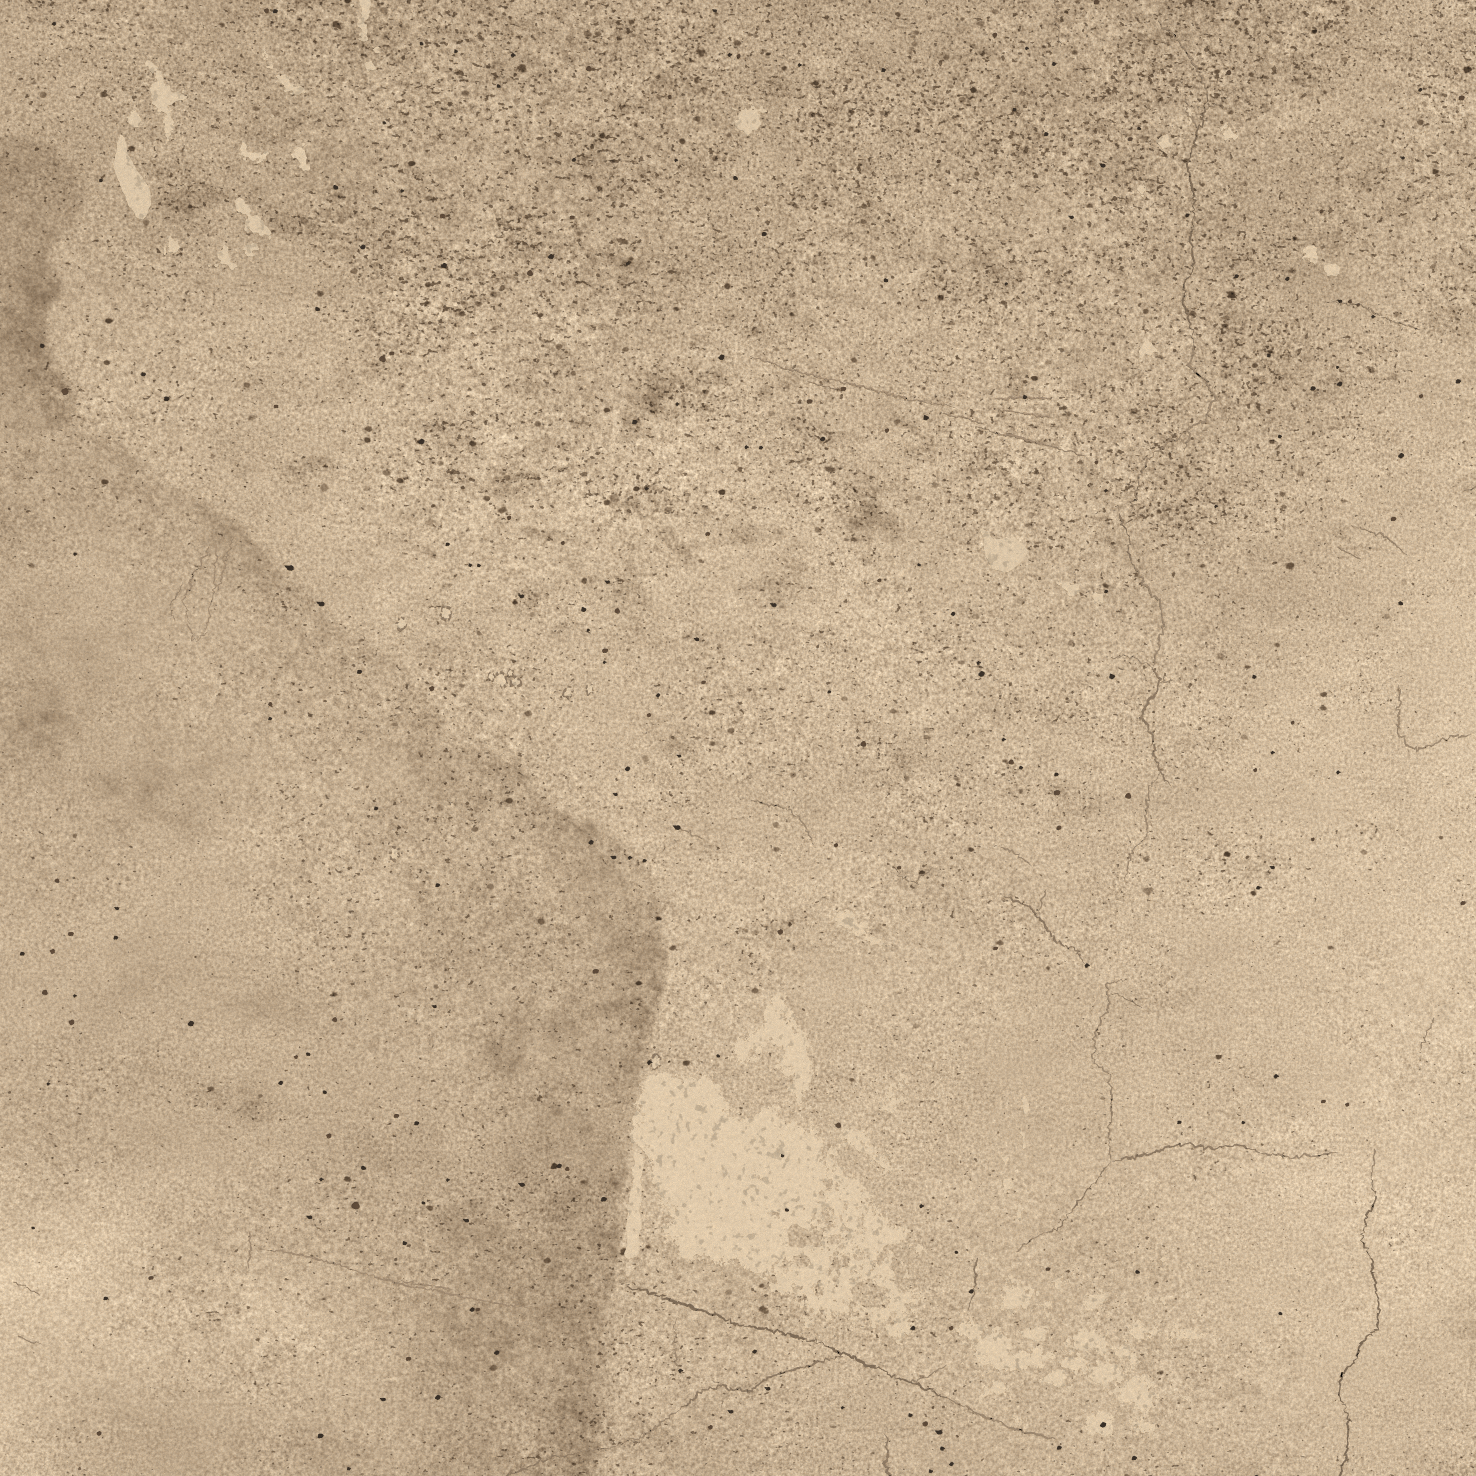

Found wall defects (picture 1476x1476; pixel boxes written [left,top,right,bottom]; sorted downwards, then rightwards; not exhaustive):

peeling [350,0,381,72]
peeling [113,60,187,220]
peeling [208,197,272,270]
peeling [240,140,269,163]
peeling [291,143,310,171]
crack [1112,20,1237,879]
damp [0,125,674,1476]
crack [1396,688,1471,752]
crack [1001,847,1338,1252]
peeling [624,992,925,1345]
crack [506,1286,1056,1476]
crack [1338,1149,1381,1476]